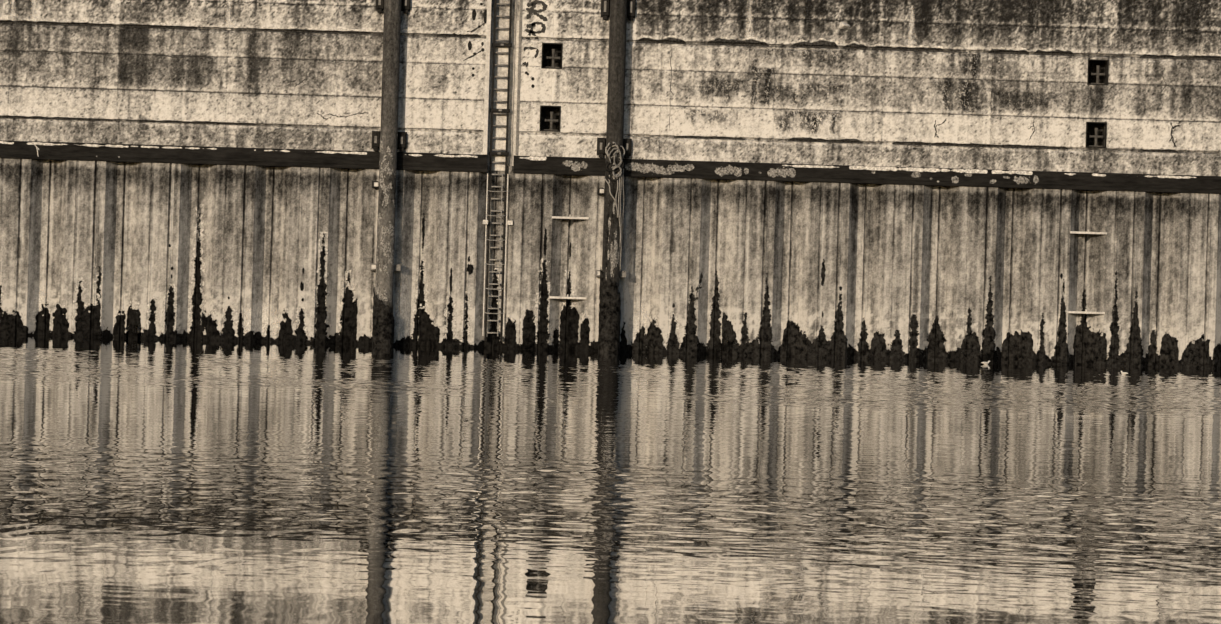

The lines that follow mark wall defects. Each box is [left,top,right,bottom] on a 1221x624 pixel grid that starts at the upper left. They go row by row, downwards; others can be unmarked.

leakage [700,49,847,133]
leakage [935,54,1054,111]
leakage [30,292,44,325]
leakage [244,306,279,336]
leakage [397,270,411,340]
leakage [630,312,649,343]